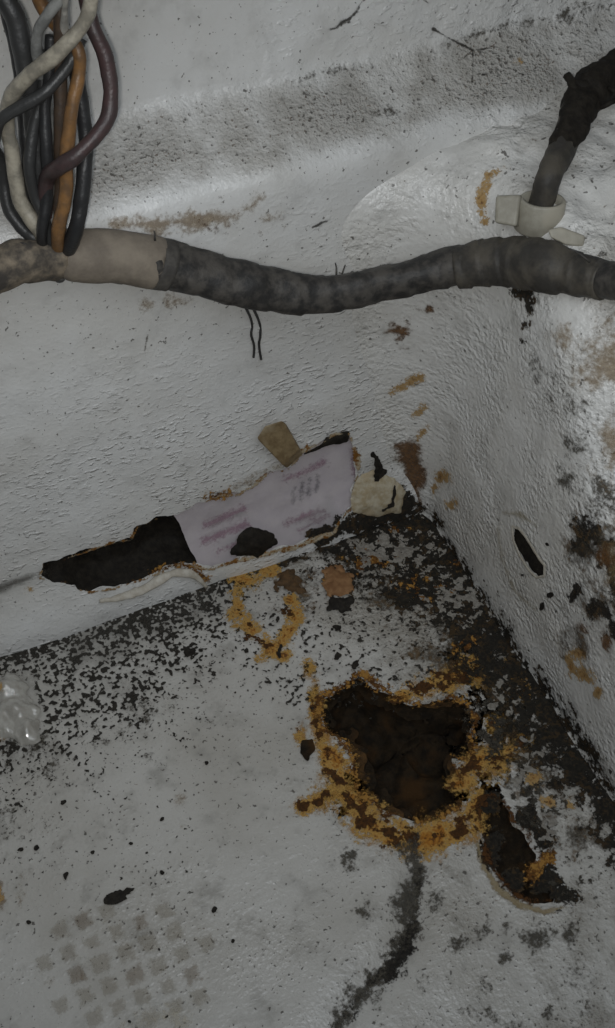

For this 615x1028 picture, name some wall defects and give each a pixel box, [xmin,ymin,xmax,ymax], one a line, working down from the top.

rust [475,168,500,226]
rust [389,373,426,395]
leakage [579,344,615,384]
spalling [41,515,197,591]
spalling [514,529,543,576]
leakage [566,514,615,639]
rust [149,403,615,875]
spalling [0,569,583,915]
peeling [363,858,424,989]